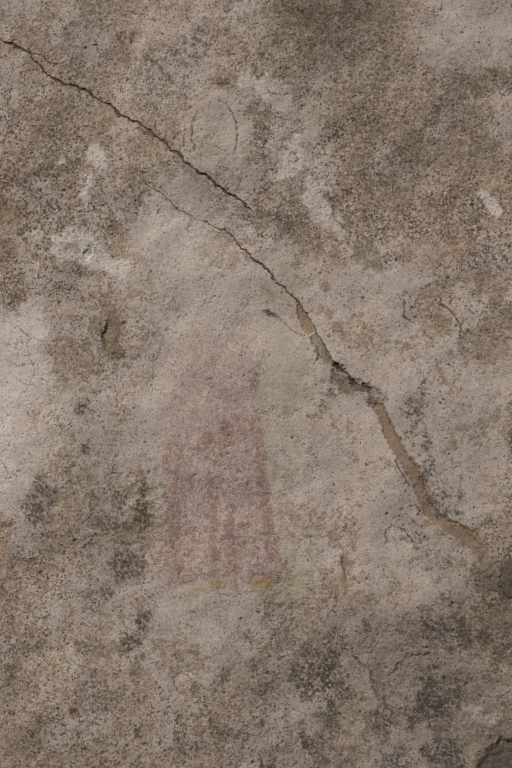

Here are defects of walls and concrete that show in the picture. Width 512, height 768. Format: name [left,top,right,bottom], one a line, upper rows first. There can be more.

crack [0,38,257,216]
damp [460,65,512,100]
crack [154,189,489,558]